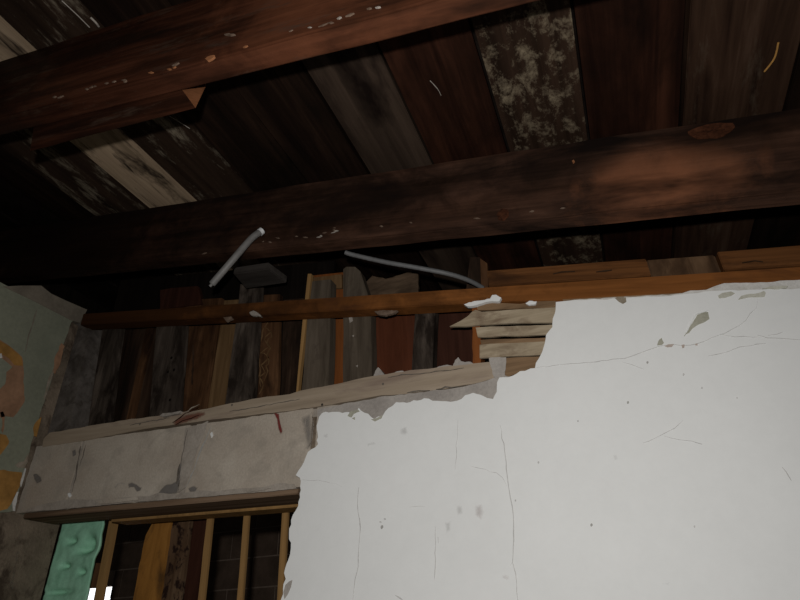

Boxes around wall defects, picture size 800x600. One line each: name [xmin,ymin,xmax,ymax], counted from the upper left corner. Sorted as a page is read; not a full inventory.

flaking render [464,295,502,308]
crack [537,301,798,369]
flaking render [657,310,709,348]
crack [455,426,518,600]